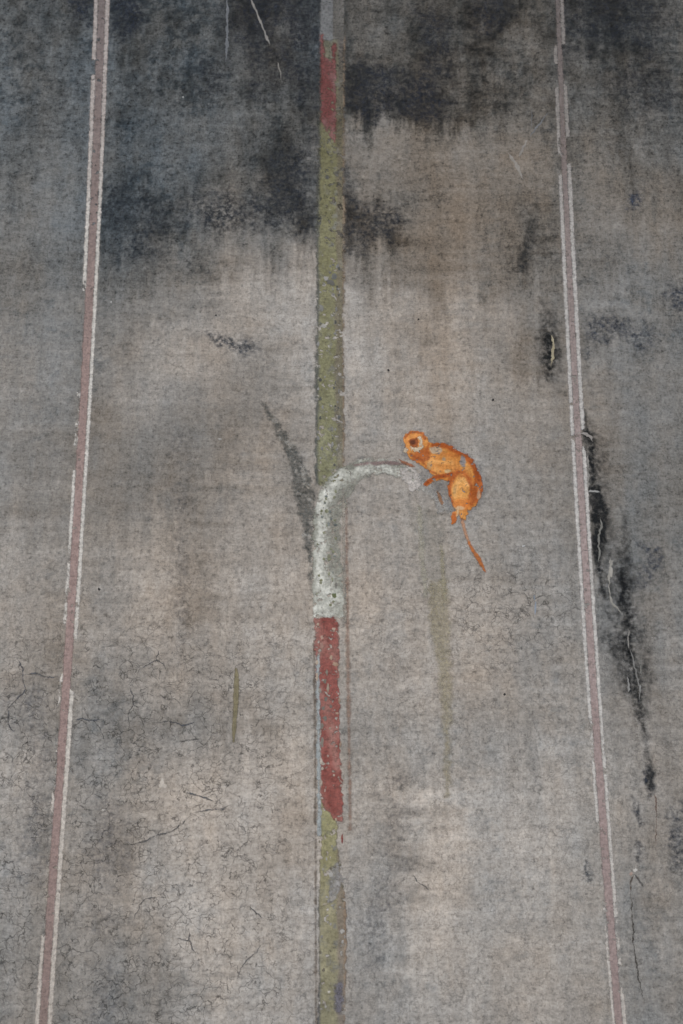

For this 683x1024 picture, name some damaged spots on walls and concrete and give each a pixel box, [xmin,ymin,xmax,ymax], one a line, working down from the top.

water stain [542,324,559,381]
water stain [583,416,646,732]
crack [7,659,58,730]
crack [126,792,225,845]
crack [630,874,643,996]